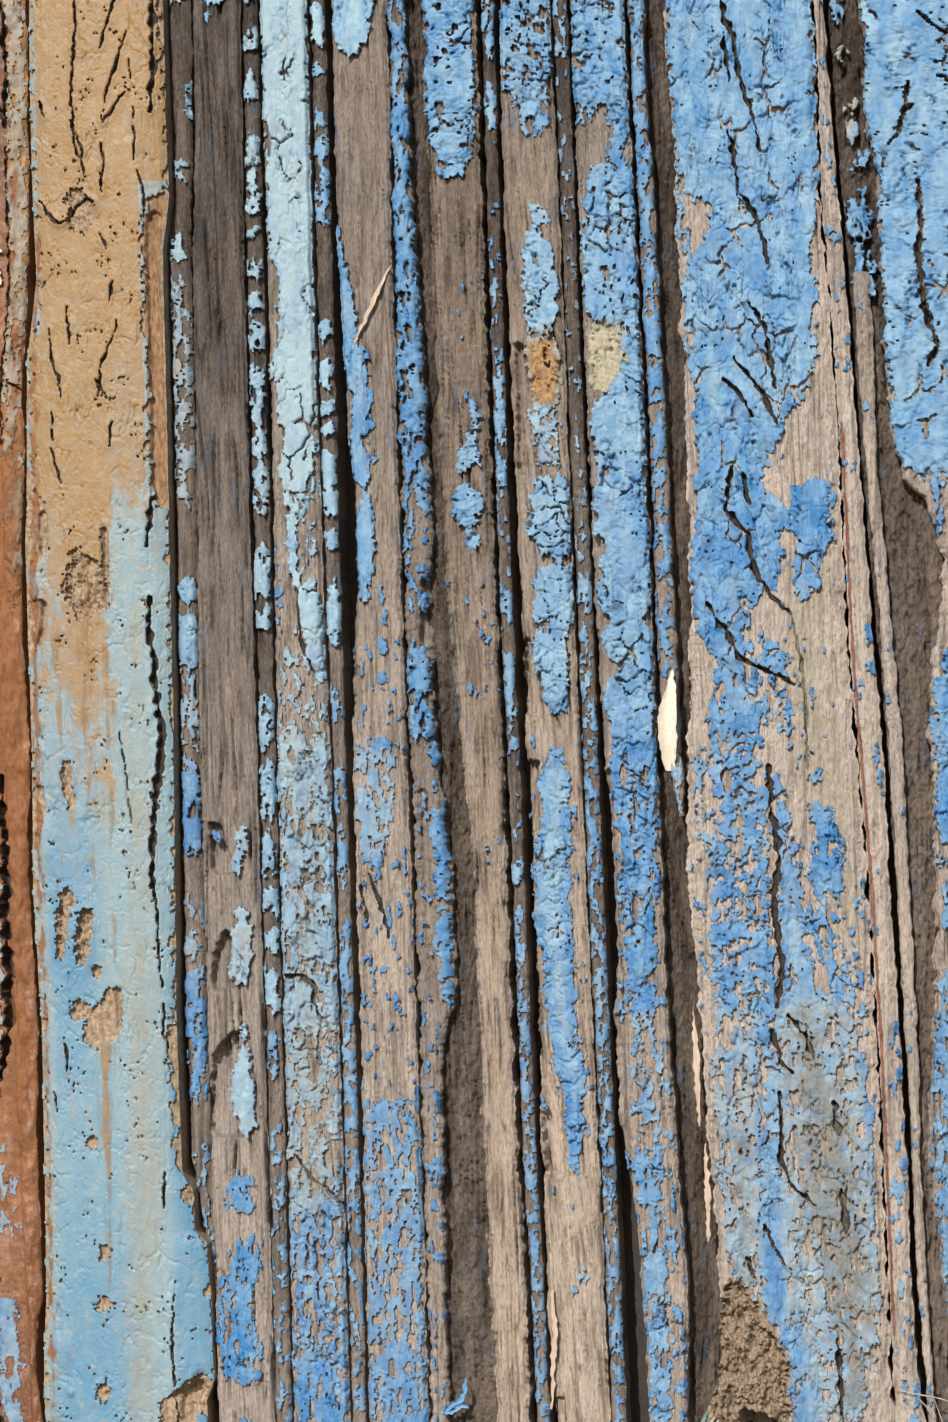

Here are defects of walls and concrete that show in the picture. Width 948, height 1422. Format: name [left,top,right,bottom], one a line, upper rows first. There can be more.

rust [15,234,40,336]
crack [49,306,72,483]
crack [0,0,158,447]
crack [720,0,769,265]
crack [722,302,778,425]
crack [889,75,948,145]
crack [914,179,940,367]
rust [0,380,57,1155]
peeling [0,0,456,1422]
peeling [421,0,948,1422]
crack [705,465,851,1234]
rust [101,1044,111,1174]